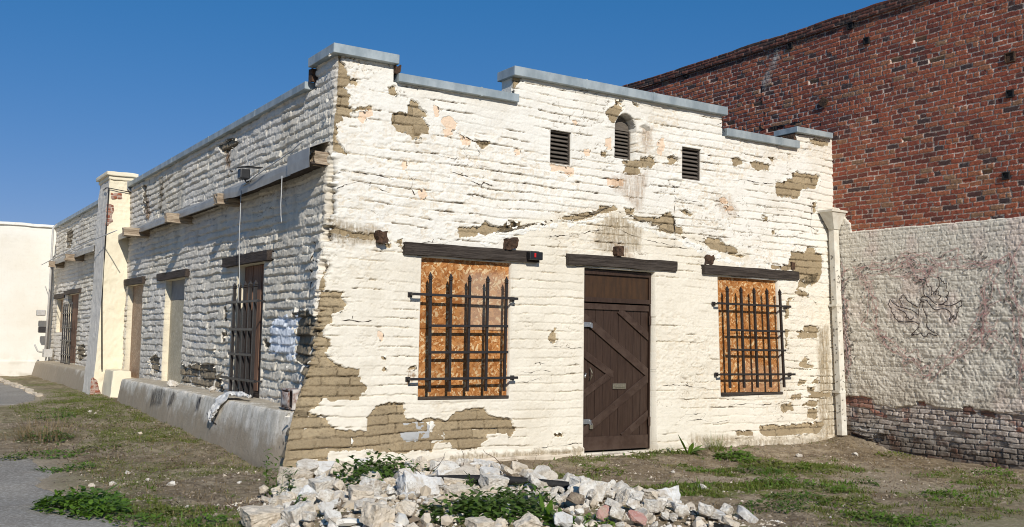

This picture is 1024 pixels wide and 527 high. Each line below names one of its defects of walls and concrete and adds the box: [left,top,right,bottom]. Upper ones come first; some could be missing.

peeling [326,53,373,155]
peeling [391,100,490,149]
peeling [605,99,638,123]
peeling [606,138,678,187]
peeling [731,156,821,213]
peeling [458,205,692,238]
peeling [701,236,743,258]
peeling [771,246,822,351]
peeling [180,307,229,392]
peeling [281,259,515,468]
peeling [735,357,832,437]
spalling [846,396,887,418]